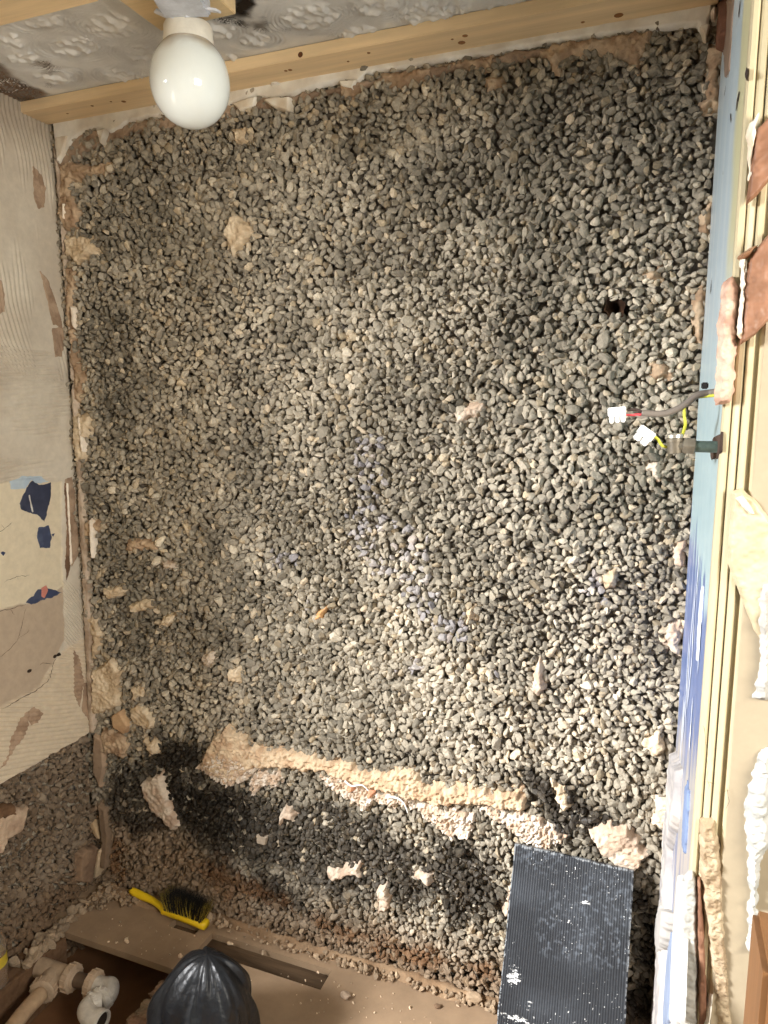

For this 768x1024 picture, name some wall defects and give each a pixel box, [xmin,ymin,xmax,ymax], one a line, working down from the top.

peeling [233,97,294,114]
peeling [699,0,740,122]
spalling [39,271,81,357]
peeling [89,518,98,558]
peeling [682,559,703,748]
spalling [74,733,114,882]
peeling [195,755,285,796]
leakage [107,734,495,922]
peeling [317,771,568,850]
leakage [525,770,617,849]
leakage [626,892,656,1024]
spalling [654,780,732,1024]